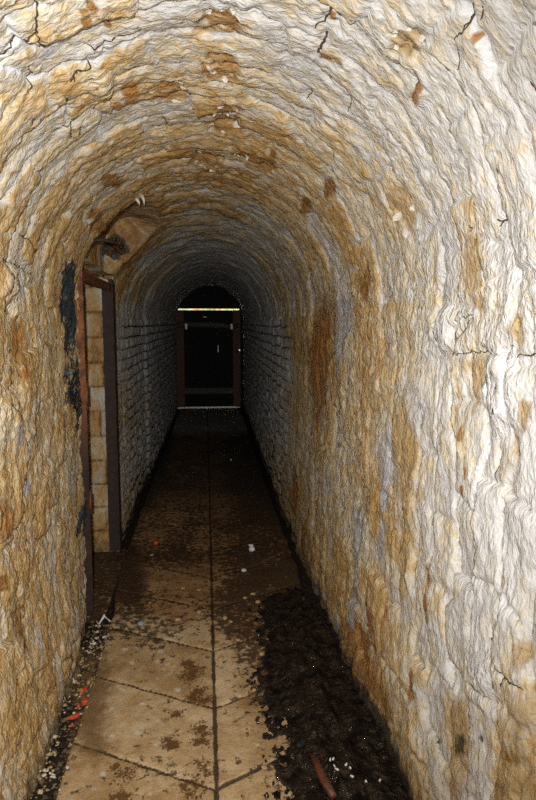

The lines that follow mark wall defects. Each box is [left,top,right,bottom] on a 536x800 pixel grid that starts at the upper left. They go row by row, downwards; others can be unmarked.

crack [0,0,45,55]
crack [315,6,333,81]
crack [454,3,484,70]
water stain [335,298,351,375]
water stain [377,396,415,559]
water stain [399,547,408,598]